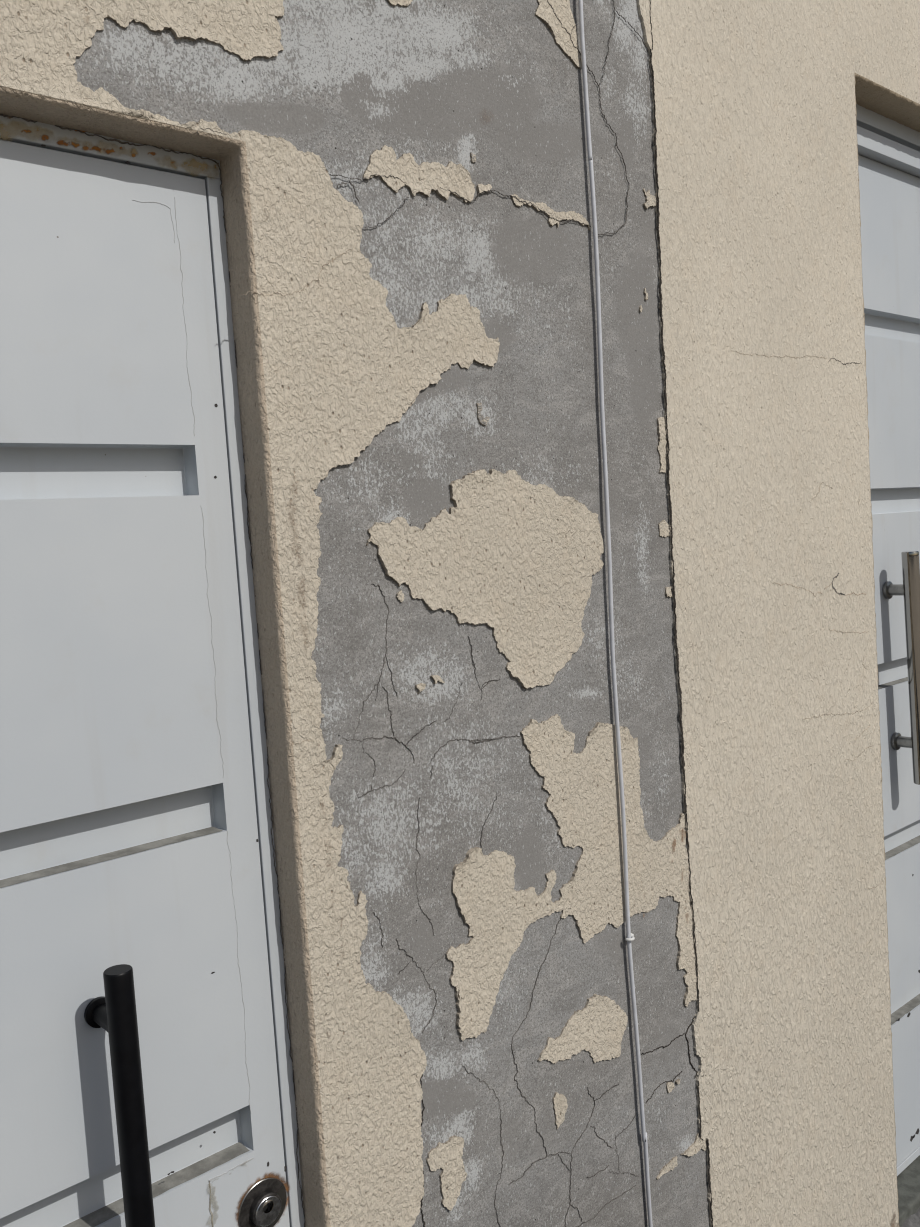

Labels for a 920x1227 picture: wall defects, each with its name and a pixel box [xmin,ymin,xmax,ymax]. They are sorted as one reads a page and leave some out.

rust [22,130,156,157]
crack [240,174,409,296]
peeling [73,0,710,1227]
crack [343,585,520,1032]
crack [440,0,713,1227]
rust [236,1173,289,1226]